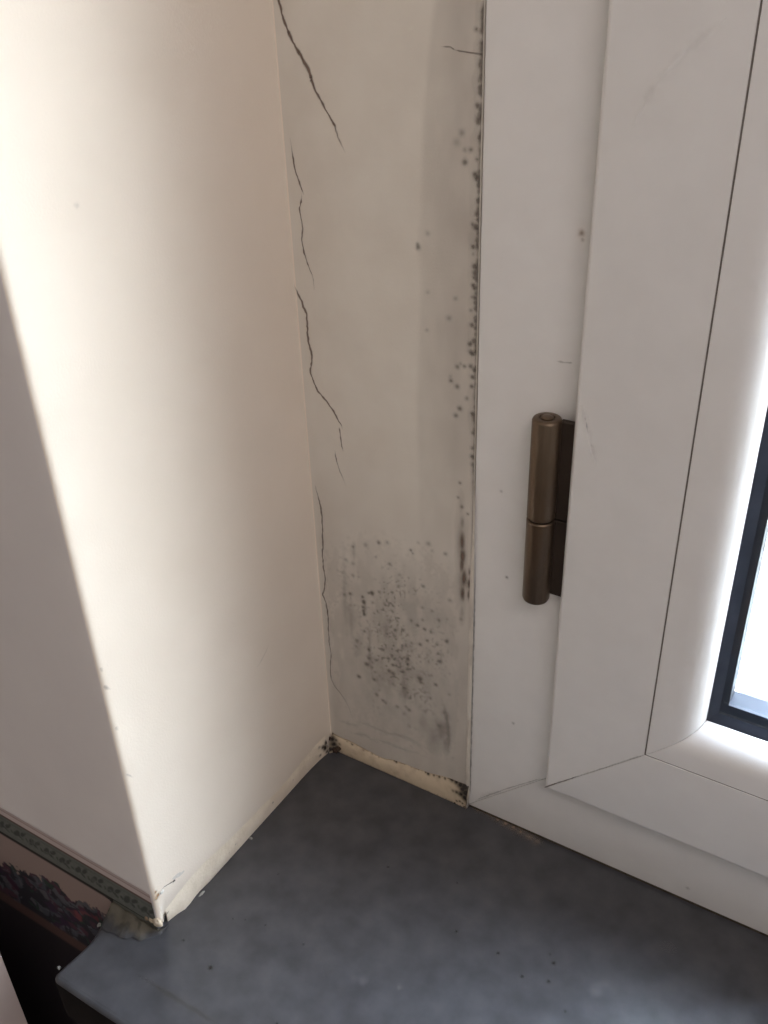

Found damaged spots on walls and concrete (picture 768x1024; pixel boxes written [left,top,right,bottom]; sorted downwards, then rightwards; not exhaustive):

crack [278,0,340,141]
crack [292,153,342,464]
mould [459,170,480,457]
crack [318,497,336,688]
water stain [460,535,470,598]